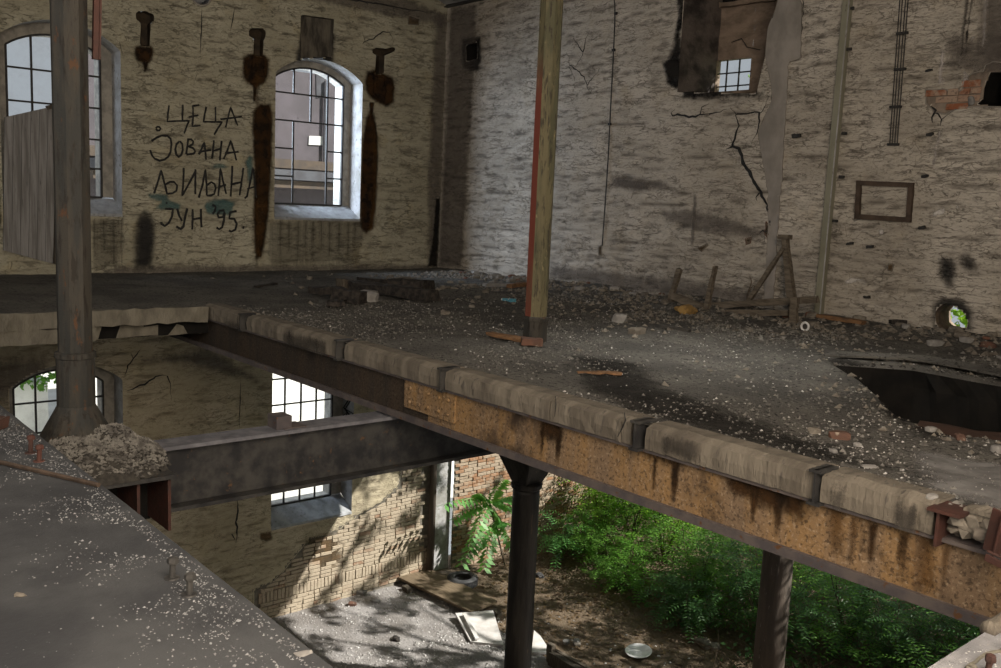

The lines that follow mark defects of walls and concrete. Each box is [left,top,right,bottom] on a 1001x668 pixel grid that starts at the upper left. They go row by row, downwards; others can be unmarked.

leakage [939,0,1001,81]
flaking render [925,61,1001,115]
crack [671,99,771,241]
crack [125,350,172,399]
spalling [835,366,1001,441]